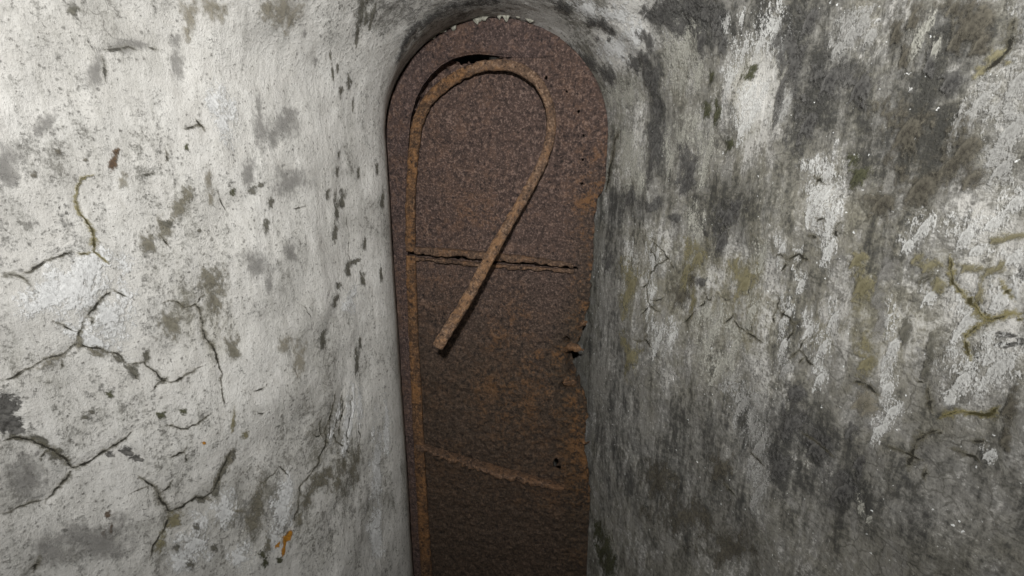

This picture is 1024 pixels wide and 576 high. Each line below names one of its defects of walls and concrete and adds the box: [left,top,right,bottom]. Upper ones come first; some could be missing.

leakage [874,0,1011,94]
leakage [612,0,728,225]
leakage [770,2,984,220]
crack [3,175,109,284]
crack [629,242,675,381]
leakage [670,199,762,318]
leakage [899,318,914,346]
crack [919,257,1024,361]
leakage [970,259,1005,319]
crack [5,290,231,557]
crack [264,393,360,521]
rust [275,530,292,557]